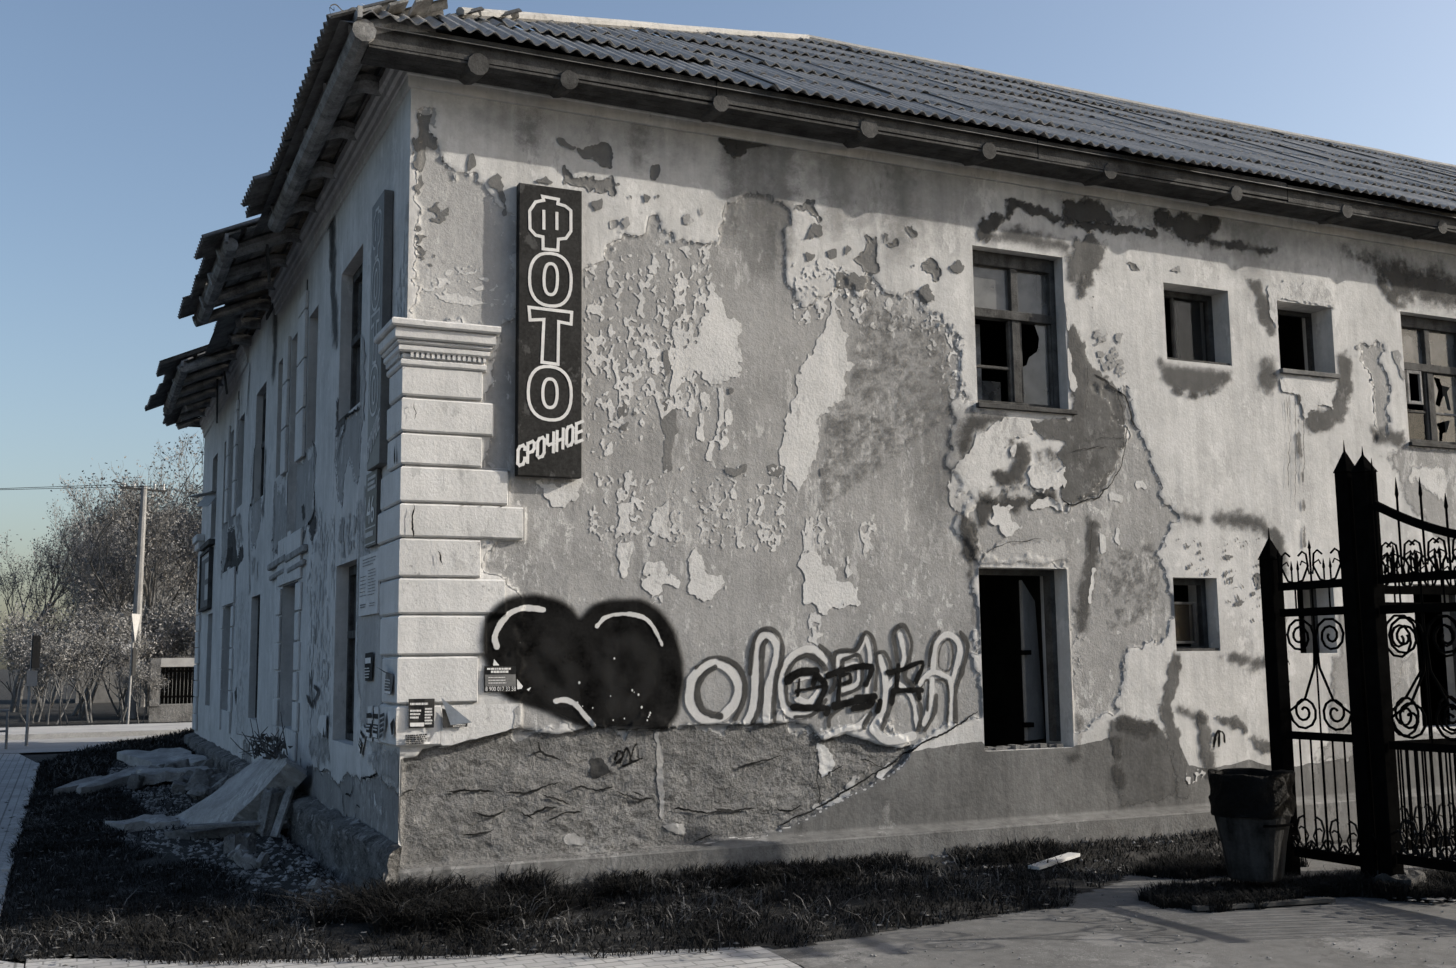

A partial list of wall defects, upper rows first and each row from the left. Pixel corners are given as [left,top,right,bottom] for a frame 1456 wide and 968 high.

damp [328,217,337,347]
peeling [221,106,1277,870]
peeling [1356,339,1456,544]
crack [401,711,978,842]